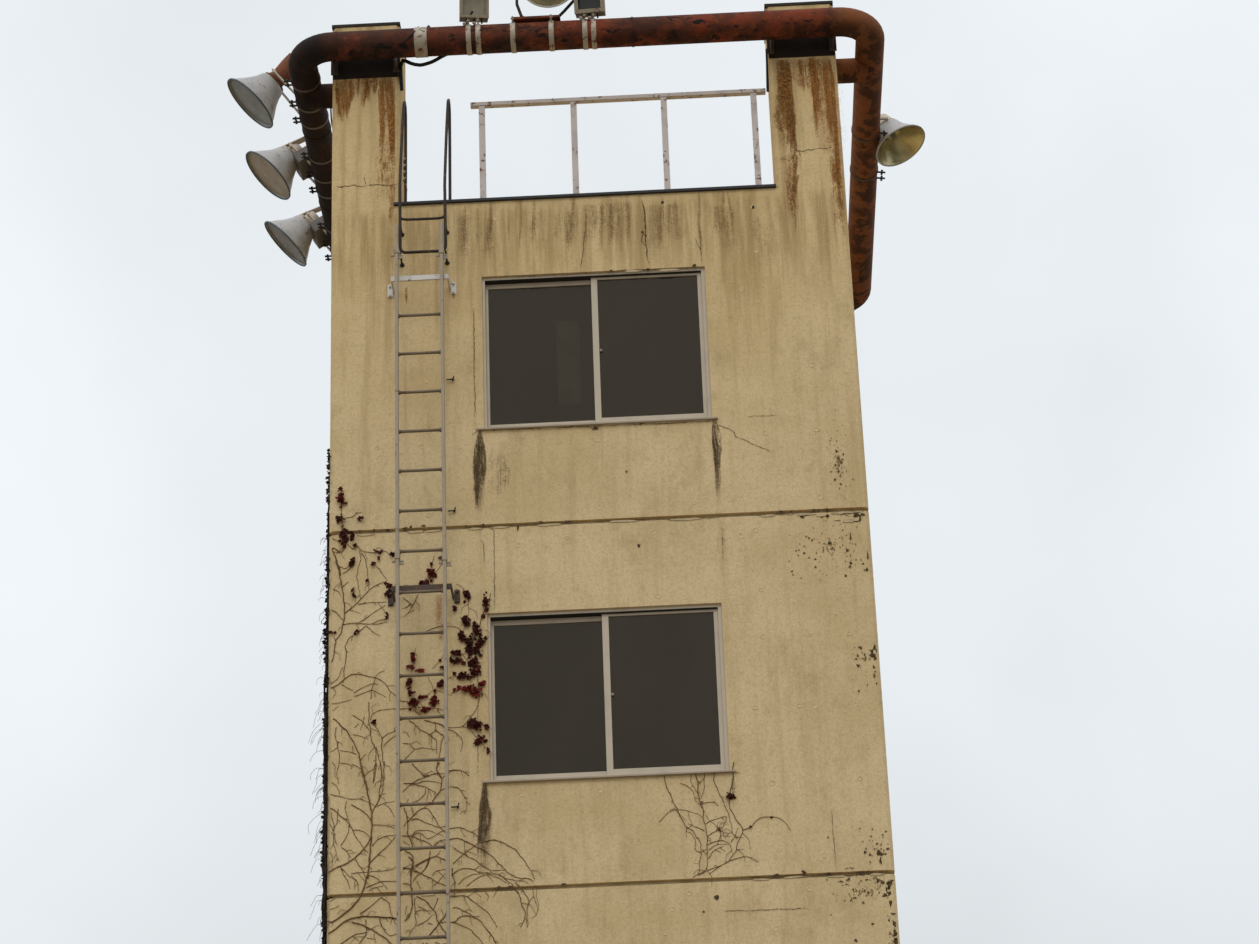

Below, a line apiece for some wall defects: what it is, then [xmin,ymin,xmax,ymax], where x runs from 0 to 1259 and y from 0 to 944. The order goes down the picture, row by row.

water stain [473,433,486,503]
water stain [712,421,720,488]